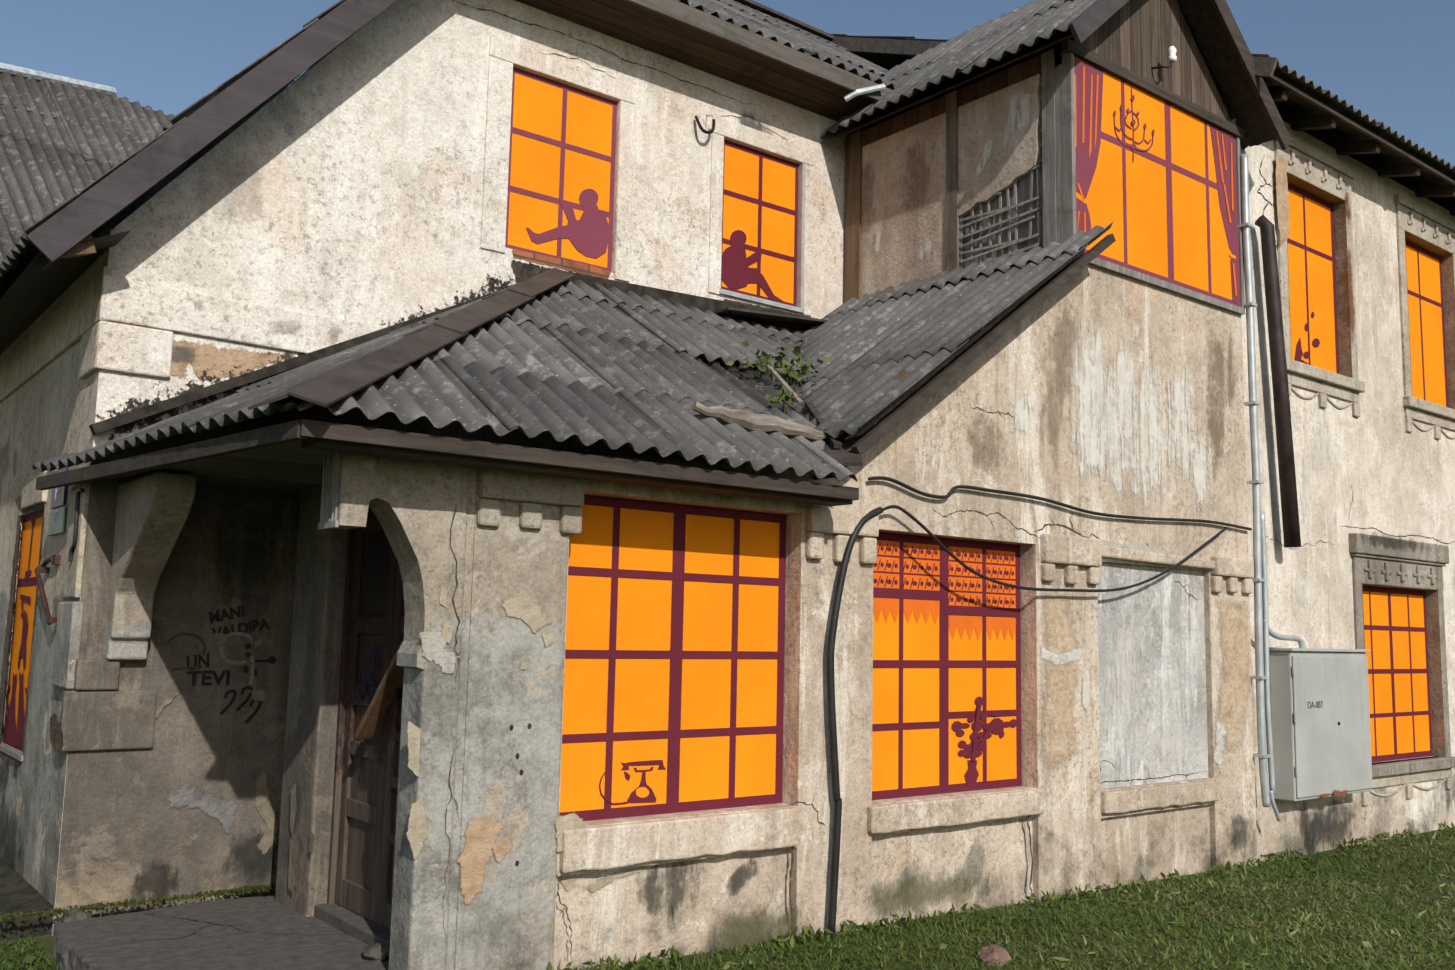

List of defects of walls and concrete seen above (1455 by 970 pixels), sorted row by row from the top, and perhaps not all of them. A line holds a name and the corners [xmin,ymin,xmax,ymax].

damp [976,91,1030,176]
spalling [95,340,304,440]
damp [1063,323,1211,507]
spalling [419,587,460,674]
spalling [49,712,63,751]
peeling [407,721,421,777]
peeling [168,770,314,893]
peeling [406,796,429,861]
peeling [458,815,512,910]
damp [645,861,692,915]
damp [730,865,757,894]
damp [1301,803,1352,854]